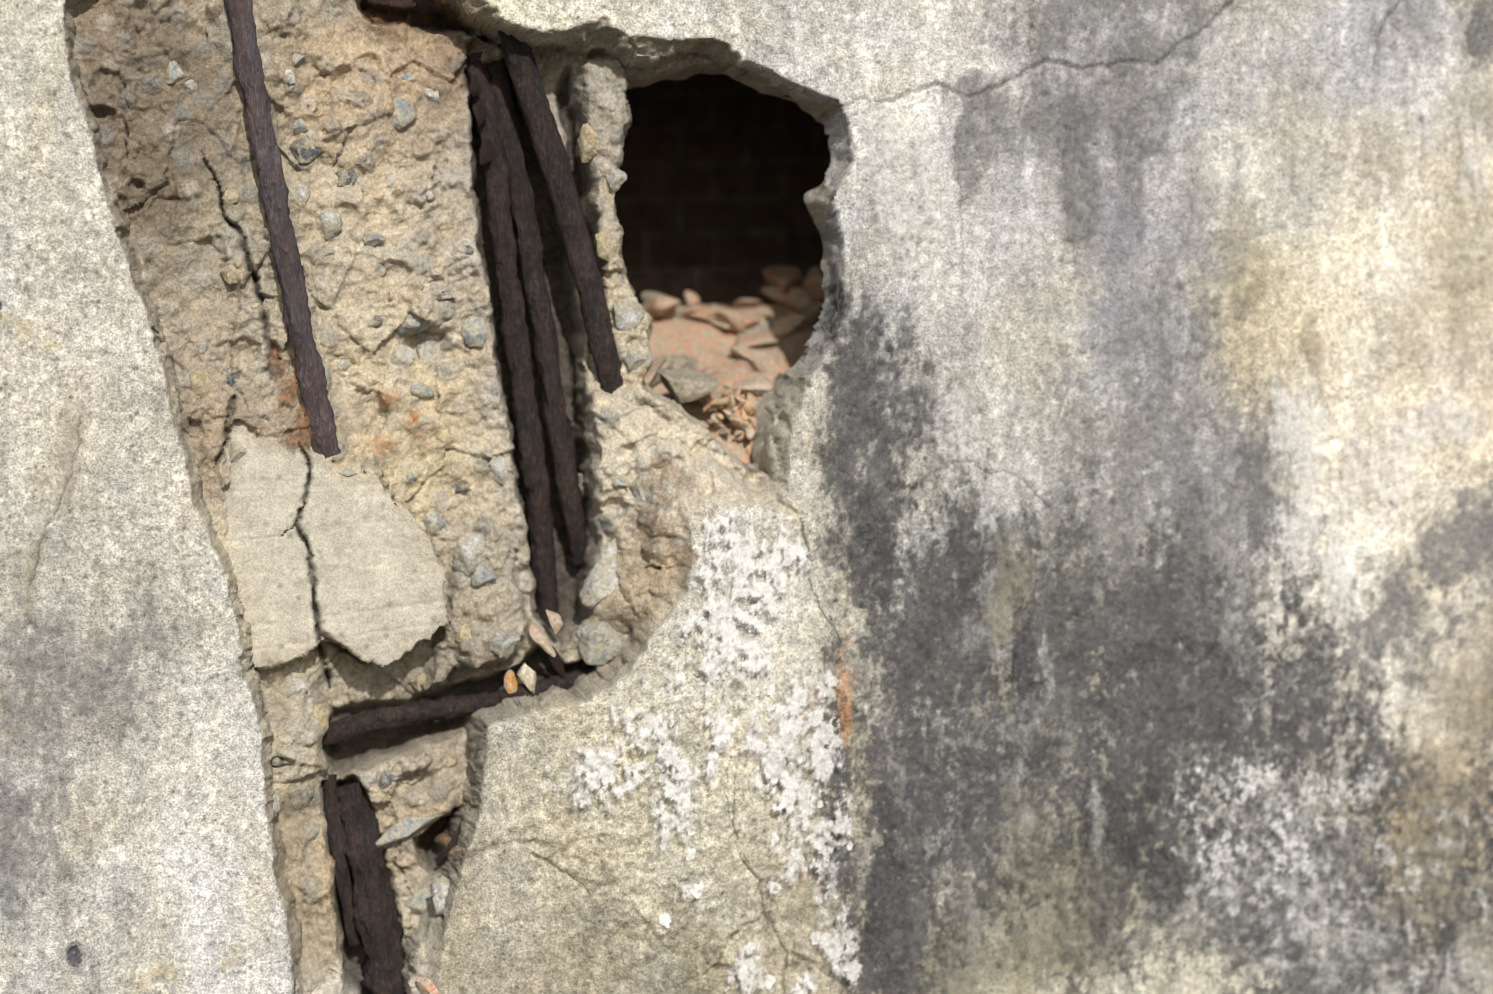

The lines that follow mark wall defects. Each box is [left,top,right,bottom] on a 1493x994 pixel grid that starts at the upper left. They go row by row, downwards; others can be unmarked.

crack [201,150,280,359]
damp [863,109,933,252]
damp [944,0,1239,273]
corrosion [267,346,311,449]
crack [295,443,330,688]
spalling [63,0,862,994]
damp [798,246,1493,994]